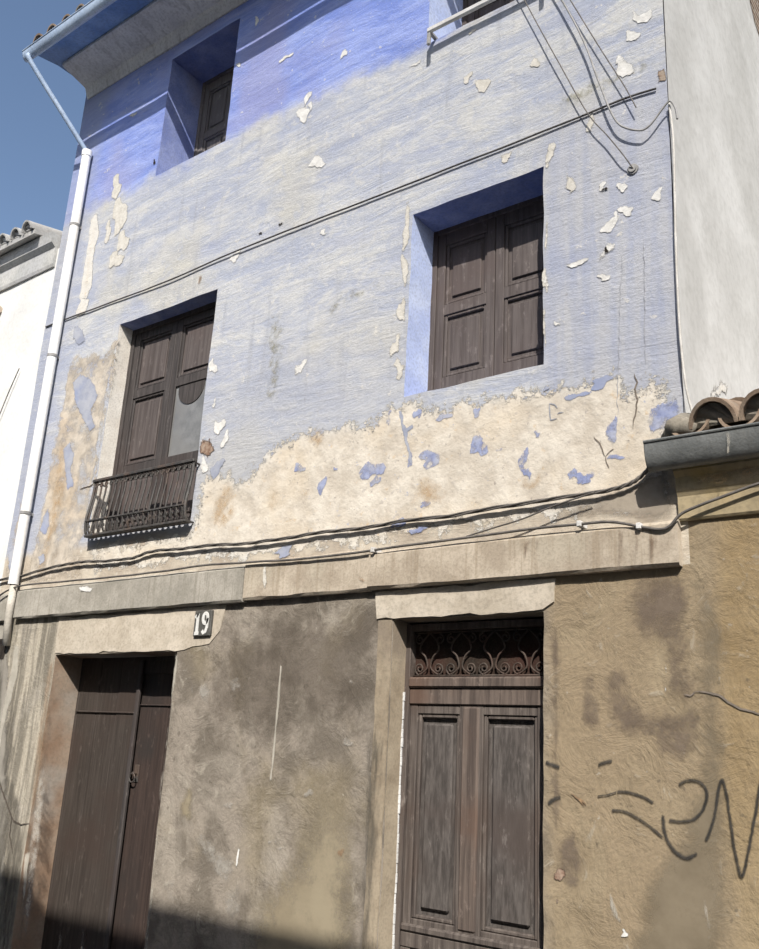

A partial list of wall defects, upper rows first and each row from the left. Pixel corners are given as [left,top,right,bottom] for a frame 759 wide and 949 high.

peeling [615,55,634,78]
peeling [296,92,312,123]
peeling [308,155,326,168]
peeling [599,181,628,192]
peeling [396,203,410,321]
peeling [566,206,633,268]
peeling [30,174,130,592]
peeling [389,334,405,380]
peeling [90,365,679,575]
water stain [0,646,30,948]
water stain [366,748,377,867]